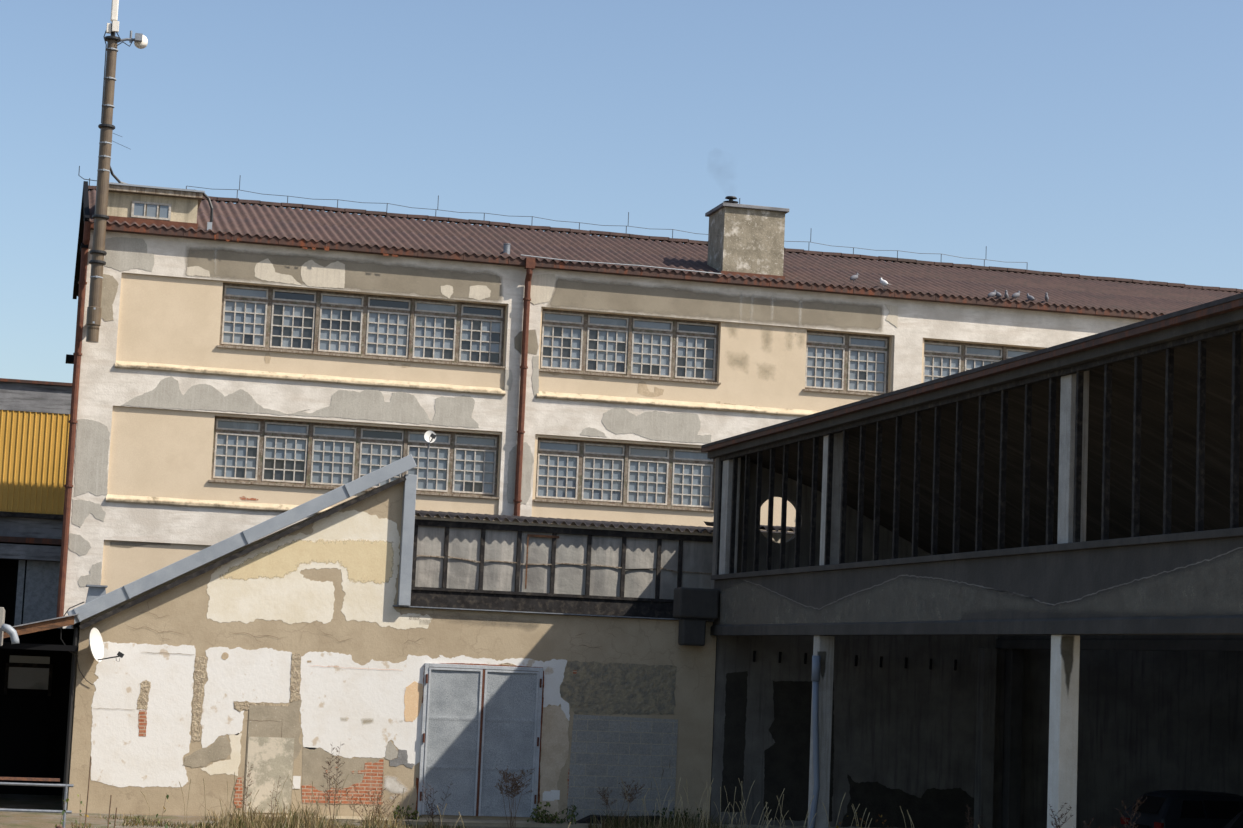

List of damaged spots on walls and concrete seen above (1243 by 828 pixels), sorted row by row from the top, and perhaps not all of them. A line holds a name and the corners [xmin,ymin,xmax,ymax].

flaking render [101,237,154,321]
flaking render [186,266,210,277]
flaking render [255,258,345,289]
flaking render [440,285,453,298]
flaking render [468,285,491,301]
flaking render [121,376,479,428]
flaking render [580,381,711,443]
flaking render [68,419,110,587]
peeling [207,510,433,630]
peeling [91,641,677,818]